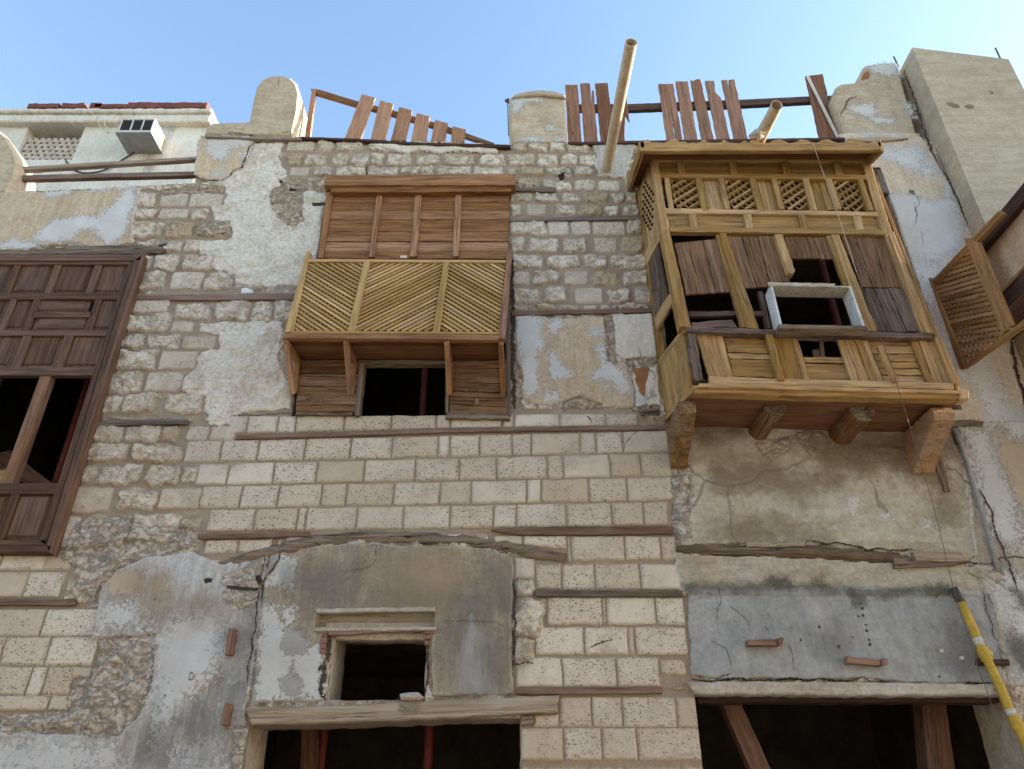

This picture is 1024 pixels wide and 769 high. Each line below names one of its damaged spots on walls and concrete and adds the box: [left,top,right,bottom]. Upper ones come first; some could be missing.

peeling [0,183,167,250]
spalling [270,173,328,230]
peeling [510,314,660,412]
spalling [670,462,694,545]
crack [952,469,1024,655]
peeling [0,517,331,769]
crack [246,552,281,683]
crack [691,591,890,683]